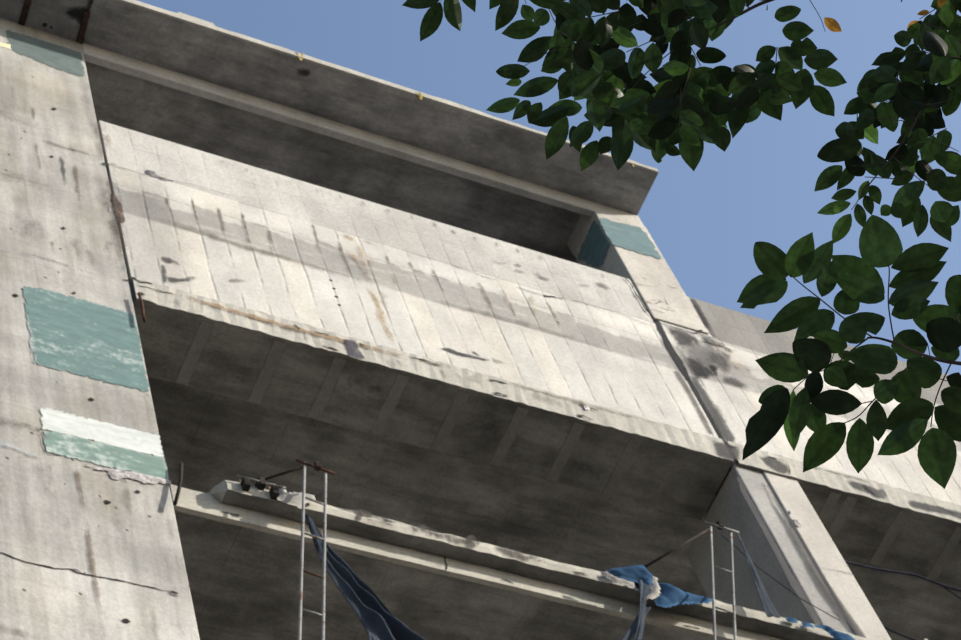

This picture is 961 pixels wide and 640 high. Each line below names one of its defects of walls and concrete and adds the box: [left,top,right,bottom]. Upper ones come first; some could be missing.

corrosion [196,299,344,343]
water stain [655,299,745,460]
crack [0,543,179,596]